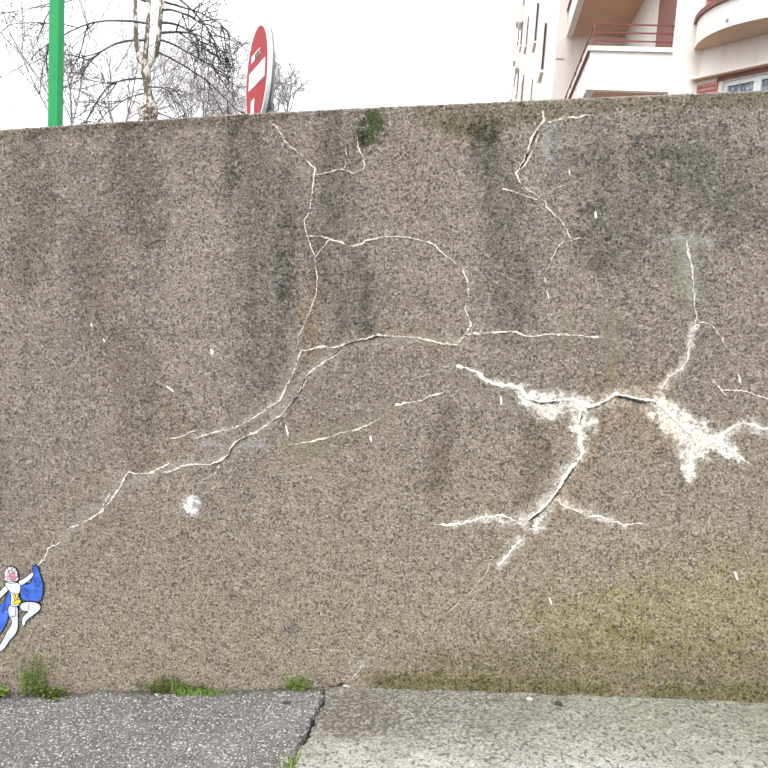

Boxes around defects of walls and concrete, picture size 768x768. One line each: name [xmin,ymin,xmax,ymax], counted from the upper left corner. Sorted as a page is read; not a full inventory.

crack [28,110,599,583]
crack [288,239,768,614]
damp [453,324,768,569]
crack [293,649,363,687]